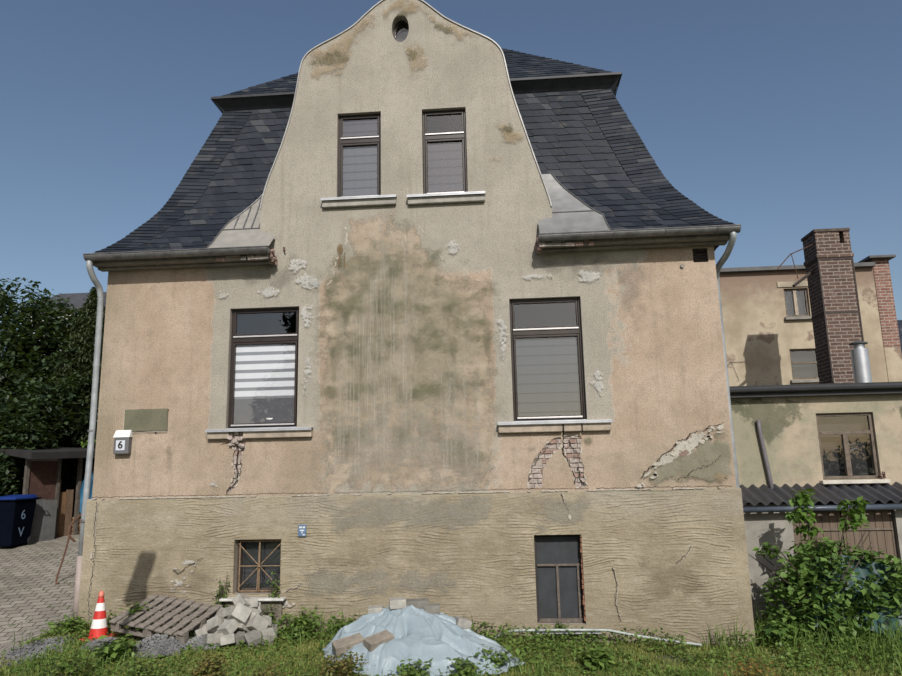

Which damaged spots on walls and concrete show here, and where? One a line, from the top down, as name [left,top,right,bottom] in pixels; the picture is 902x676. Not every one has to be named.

spalling [215,249,278,265]
flaking render [289,213,508,495]
flaking render [527,424,588,488]
flaking render [636,422,732,487]
crack [88,432,725,622]